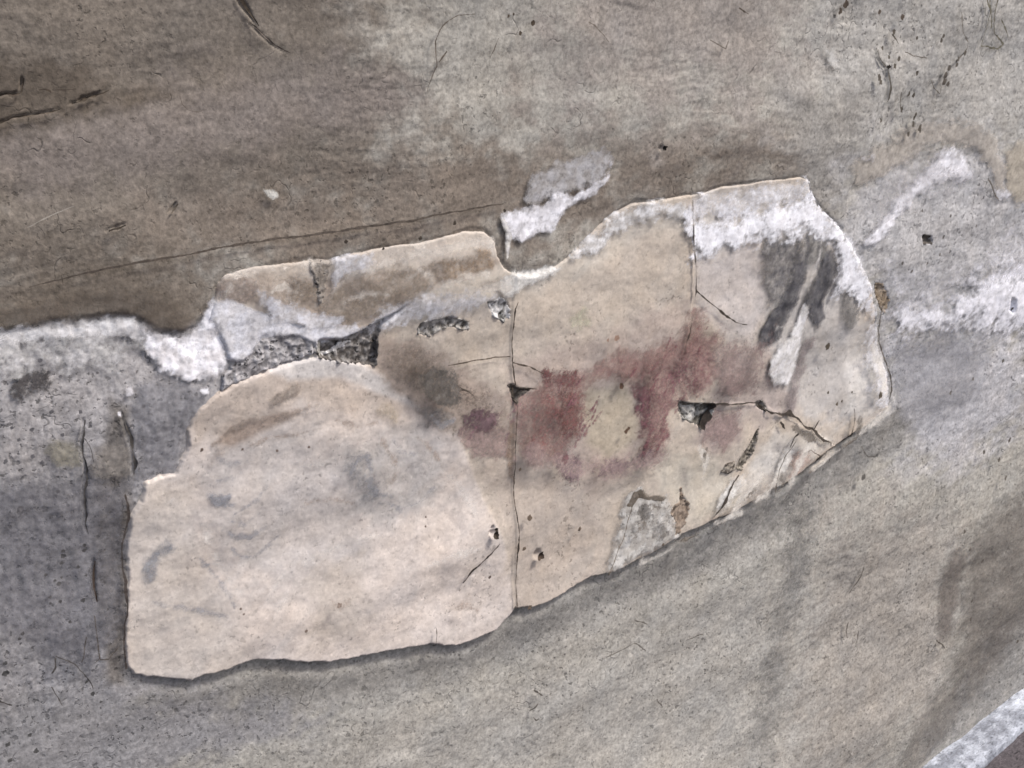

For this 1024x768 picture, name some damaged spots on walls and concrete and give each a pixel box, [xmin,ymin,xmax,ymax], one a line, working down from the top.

water stain [501,146,612,259]
water stain [0,265,559,394]
spalling [220,310,399,391]
water stain [333,253,374,286]
crack [684,216,747,354]
water stain [569,119,1024,408]
crack [448,303,544,608]
crack [699,402,855,517]
crack [51,412,138,706]
crack [609,495,640,575]
spalling [608,486,690,571]